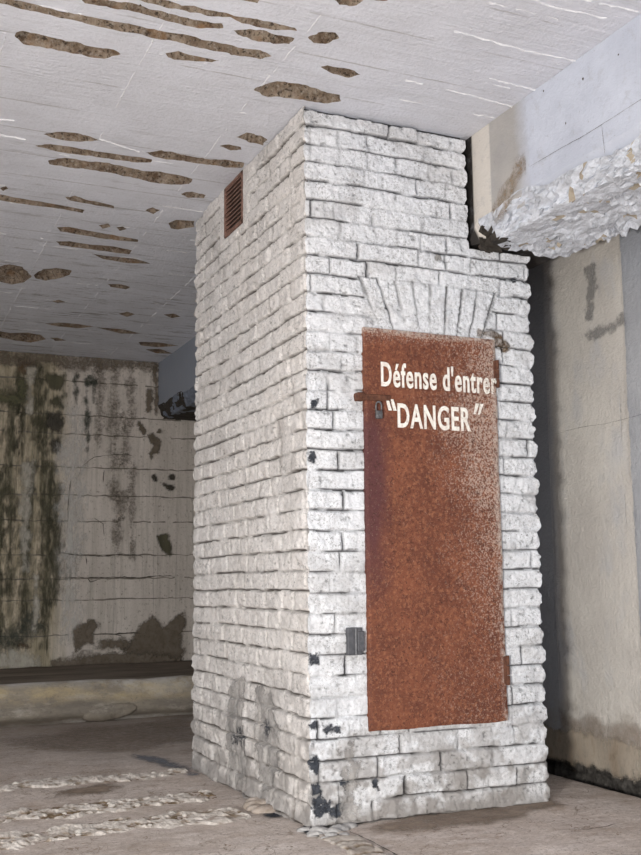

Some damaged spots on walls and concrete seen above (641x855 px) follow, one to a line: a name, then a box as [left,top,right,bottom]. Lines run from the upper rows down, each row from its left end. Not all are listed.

spalling [0,0,297,62]
spalling [308,32,339,44]
spalling [322,65,360,78]
spalling [254,81,341,103]
spalling [37,132,267,198]
spalling [0,186,114,213]
spalling [478,134,641,259]
spalling [56,223,150,264]
spalling [0,264,71,284]
spalling [146,386,197,421]
peeling [137,421,161,459]
leakage [0,364,187,669]